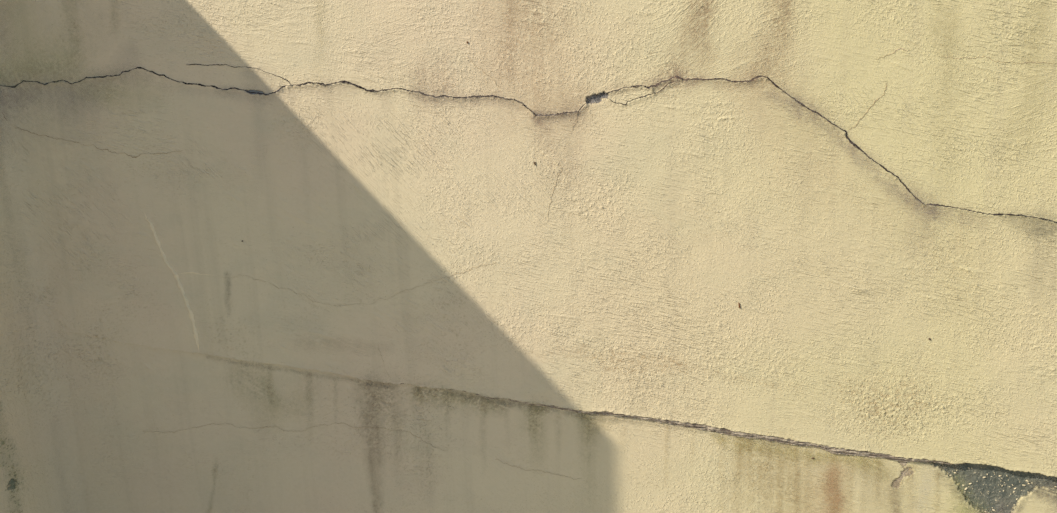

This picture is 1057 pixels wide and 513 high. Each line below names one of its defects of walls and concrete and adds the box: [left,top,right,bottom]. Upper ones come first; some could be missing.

crack [0,62,1057,223]
flaking render [934,462,1057,513]